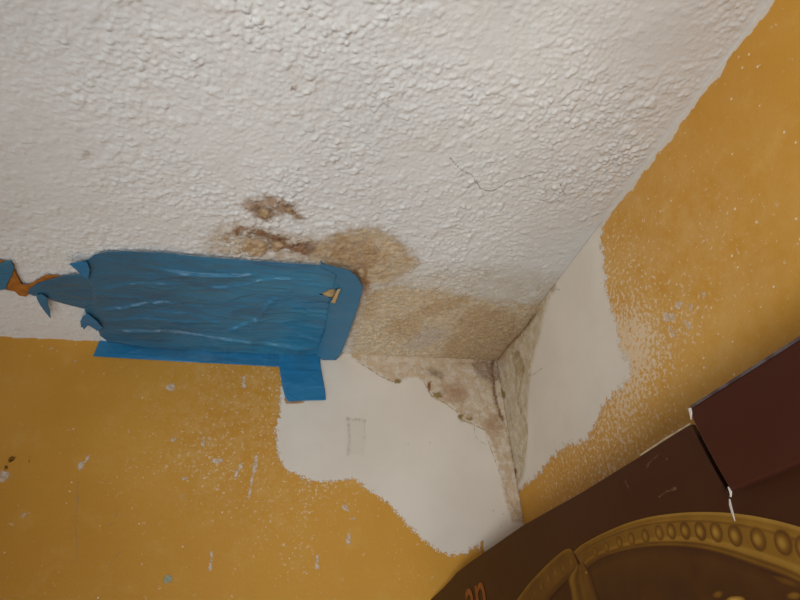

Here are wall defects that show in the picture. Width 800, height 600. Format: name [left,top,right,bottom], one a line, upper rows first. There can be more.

damp [243,197,302,221]
damp [218,227,555,521]
peeling [273,224,633,557]